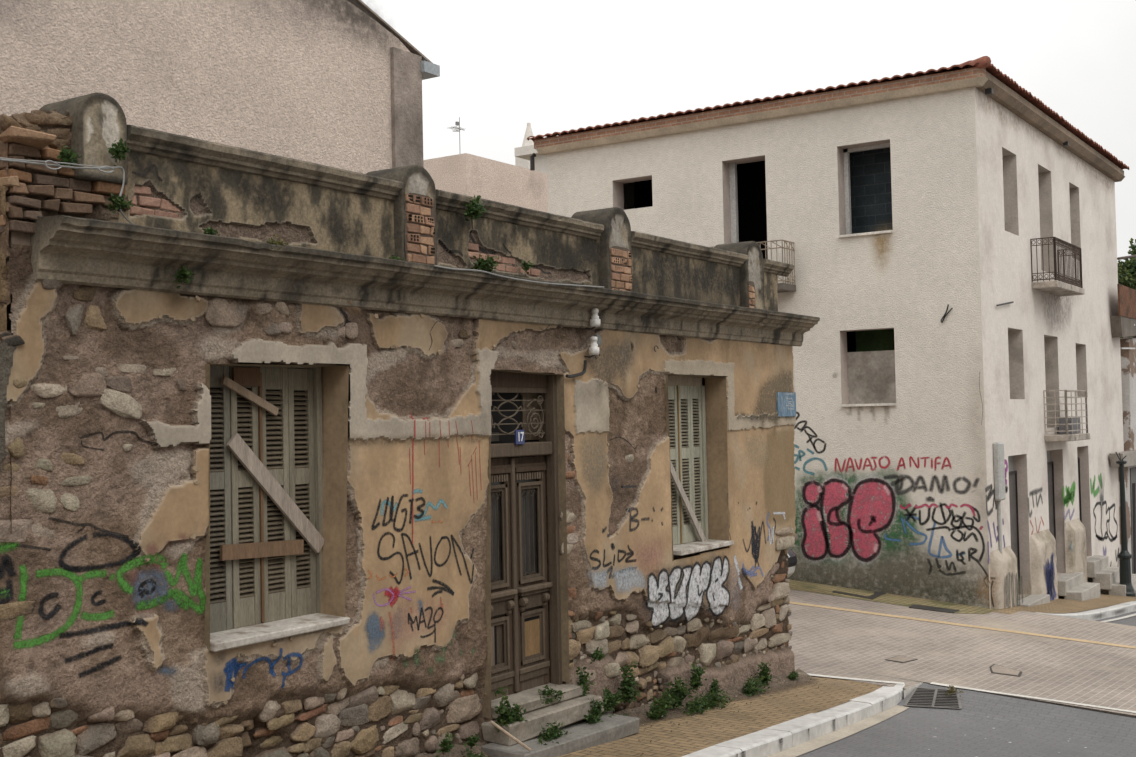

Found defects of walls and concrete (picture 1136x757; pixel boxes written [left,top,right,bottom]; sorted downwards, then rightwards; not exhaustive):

flaking render [405,193,592,282]
flaking render [658,335,687,356]
flaking render [0,244,603,722]
flaking render [607,369,668,537]
flaking render [565,429,775,626]
flaking render [566,655,631,707]
flaking render [660,649,795,701]